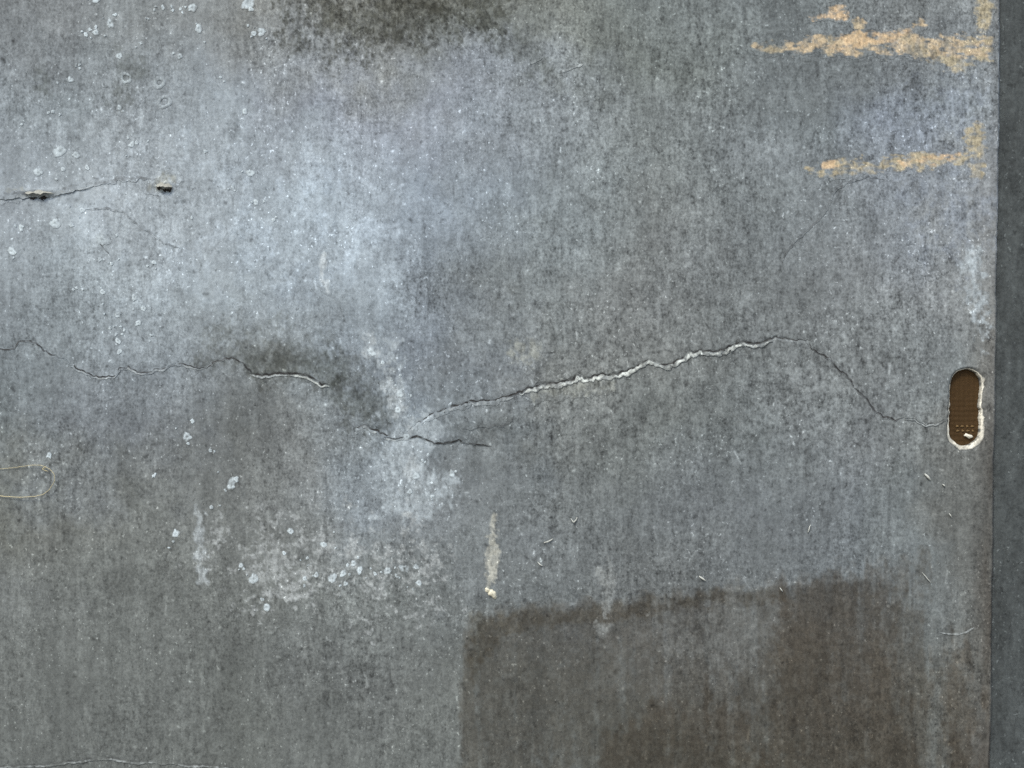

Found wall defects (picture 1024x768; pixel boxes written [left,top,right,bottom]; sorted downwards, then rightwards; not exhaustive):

peeling [807,0,870,30]
peeling [819,157,841,171]
peeling [893,149,962,171]
crack [0,175,179,248]
crack [0,340,330,388]
crack [355,336,946,446]
leakage [162,304,992,768]